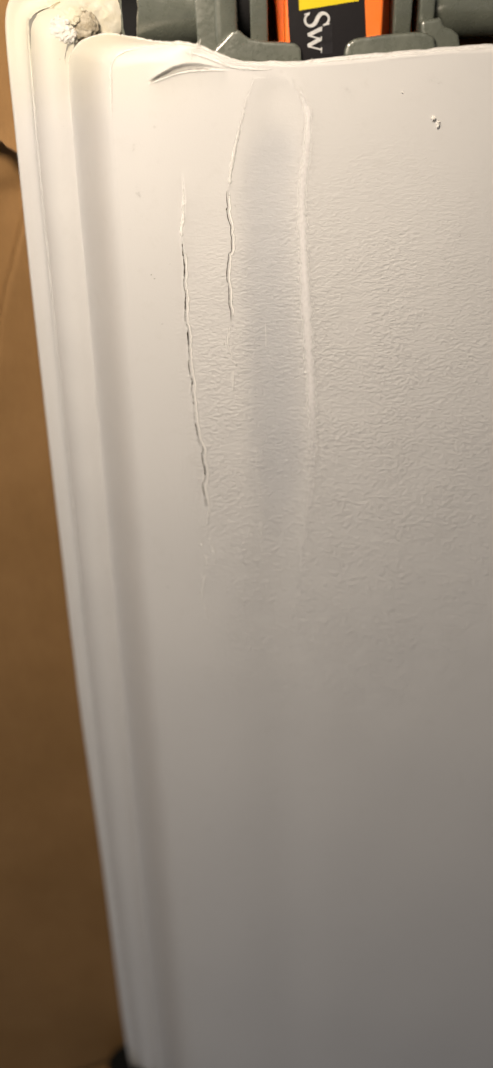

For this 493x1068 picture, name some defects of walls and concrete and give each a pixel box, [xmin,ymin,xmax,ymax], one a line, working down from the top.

crack [180,211,215,622]
crack [223,142,237,391]